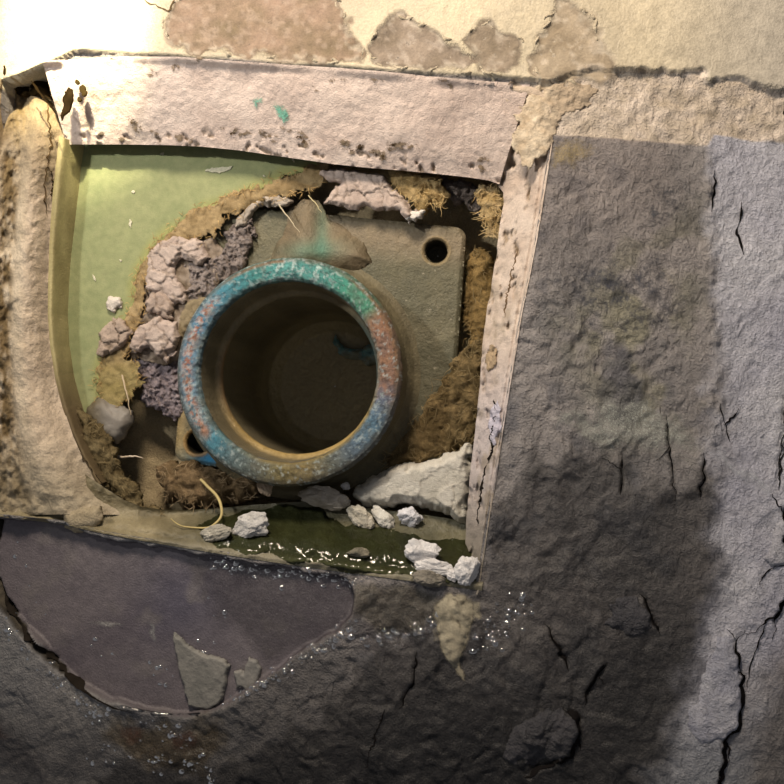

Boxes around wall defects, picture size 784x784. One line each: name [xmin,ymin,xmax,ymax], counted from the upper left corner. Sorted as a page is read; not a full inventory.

spalling [162,0,616,88]
spalling [260,139,503,262]
crack [710,171,718,212]
crack [735,202,744,255]
spalling [114,378,183,510]
spalling [340,486,366,508]
spalling [384,504,454,520]
crack [476,400,496,524]
crack [720,404,739,441]
crack [772,413,784,543]
spalling [0,518,354,714]
crack [718,601,784,784]